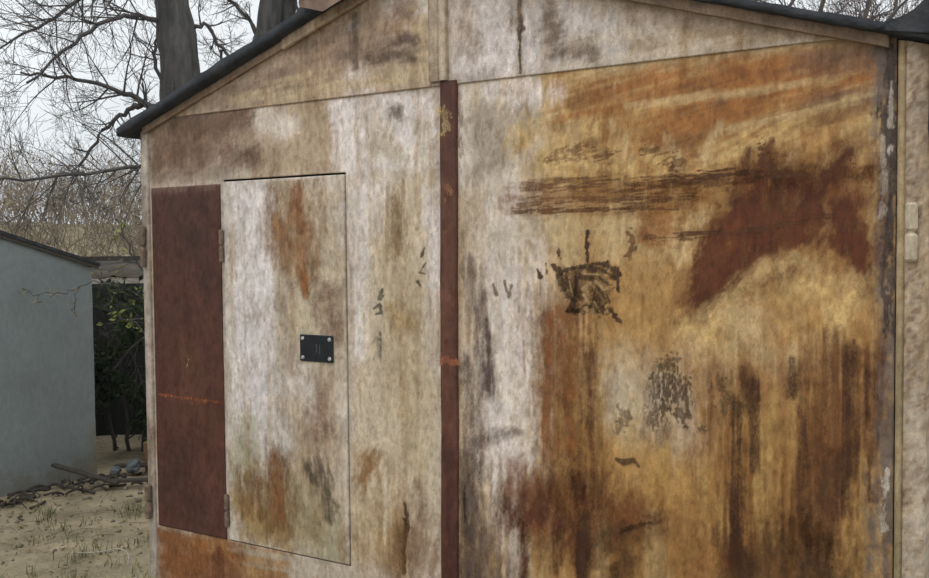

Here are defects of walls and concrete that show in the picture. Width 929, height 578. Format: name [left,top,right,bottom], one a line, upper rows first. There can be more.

damp [351,13,415,70]
corrosion [267,182,319,299]
peeling [537,230,622,323]
peeling [623,227,637,261]
corrosion [515,137,877,323]
corrosion [239,449,289,532]
corrosion [500,278,656,578]
peeling [613,405,632,434]
peeling [644,352,707,443]
corrosion [710,332,878,578]